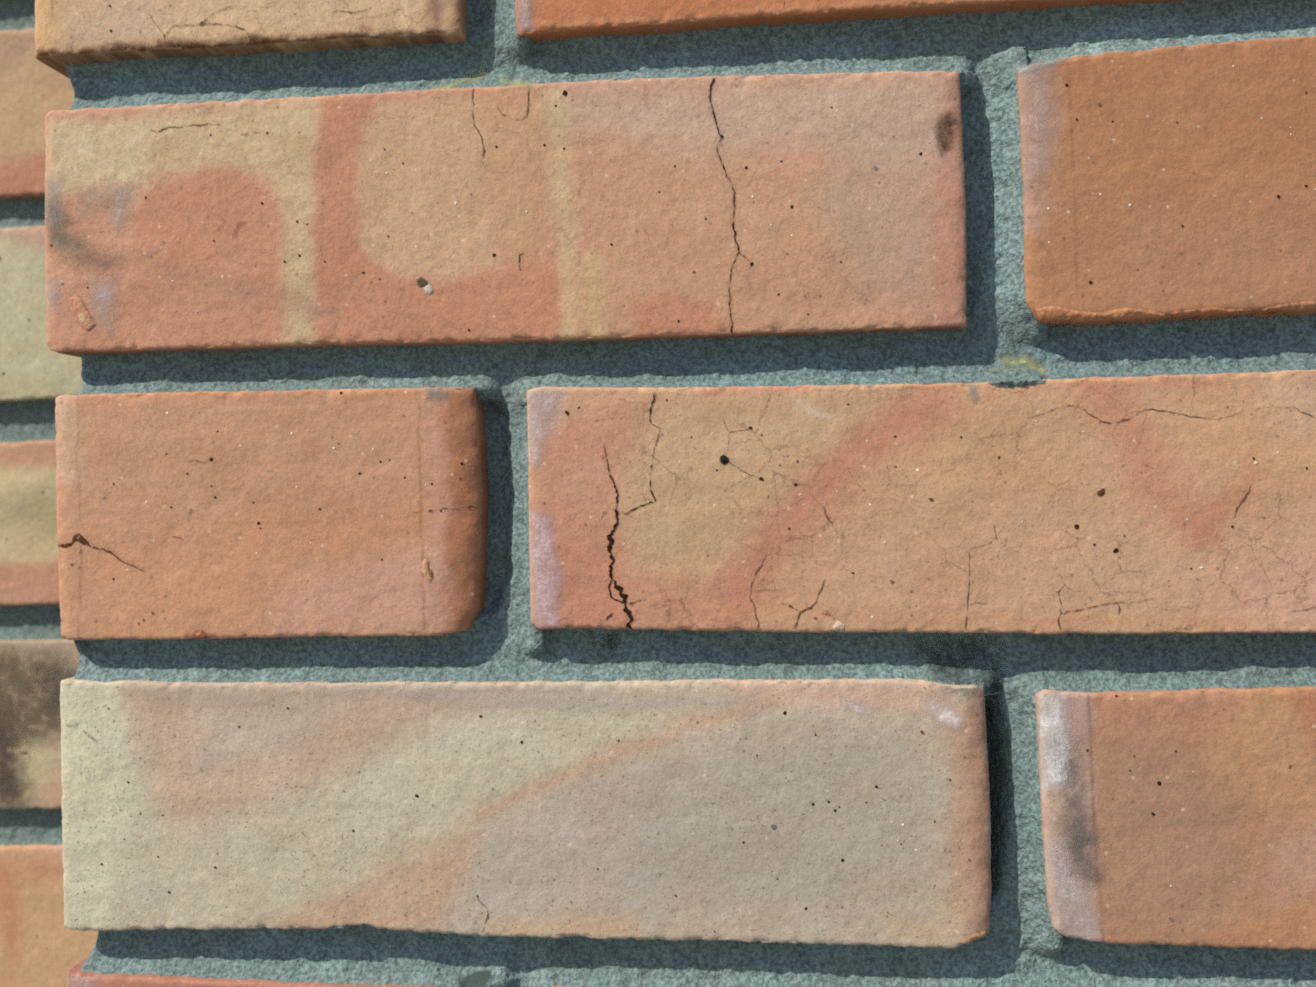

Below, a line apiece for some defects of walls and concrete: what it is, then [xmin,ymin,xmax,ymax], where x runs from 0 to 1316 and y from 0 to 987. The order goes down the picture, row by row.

crack [709,78,749,333]
crack [1036,405,1264,423]
crack [57,533,140,570]
crack [603,393,660,629]
crack [749,554,825,629]
crack [965,525,996,629]
crack [1055,586,1156,627]
efflorescence [1040,694,1085,787]
efflorescence [1047,844,1091,939]